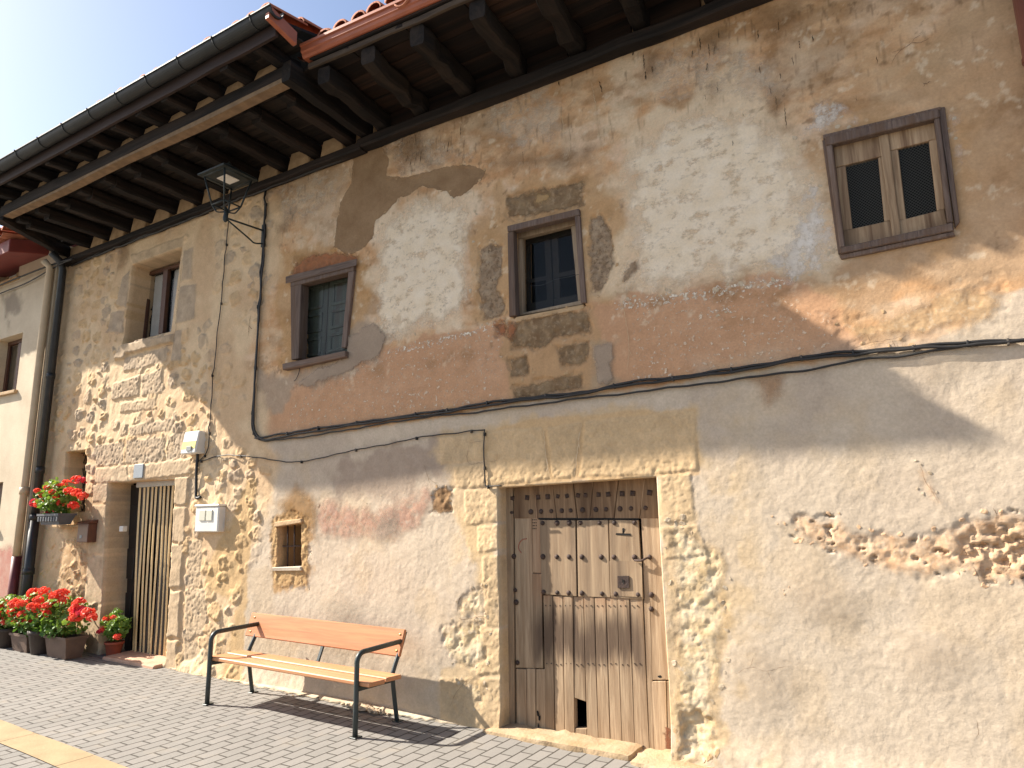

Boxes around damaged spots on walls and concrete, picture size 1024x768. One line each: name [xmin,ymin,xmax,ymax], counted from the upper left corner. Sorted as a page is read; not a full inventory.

peeling [288,147,591,428]
peeling [588,116,997,380]
spalling [431,485,452,513]
spalling [445,583,492,668]
spalling [664,514,732,763]
spalling [771,509,1024,588]